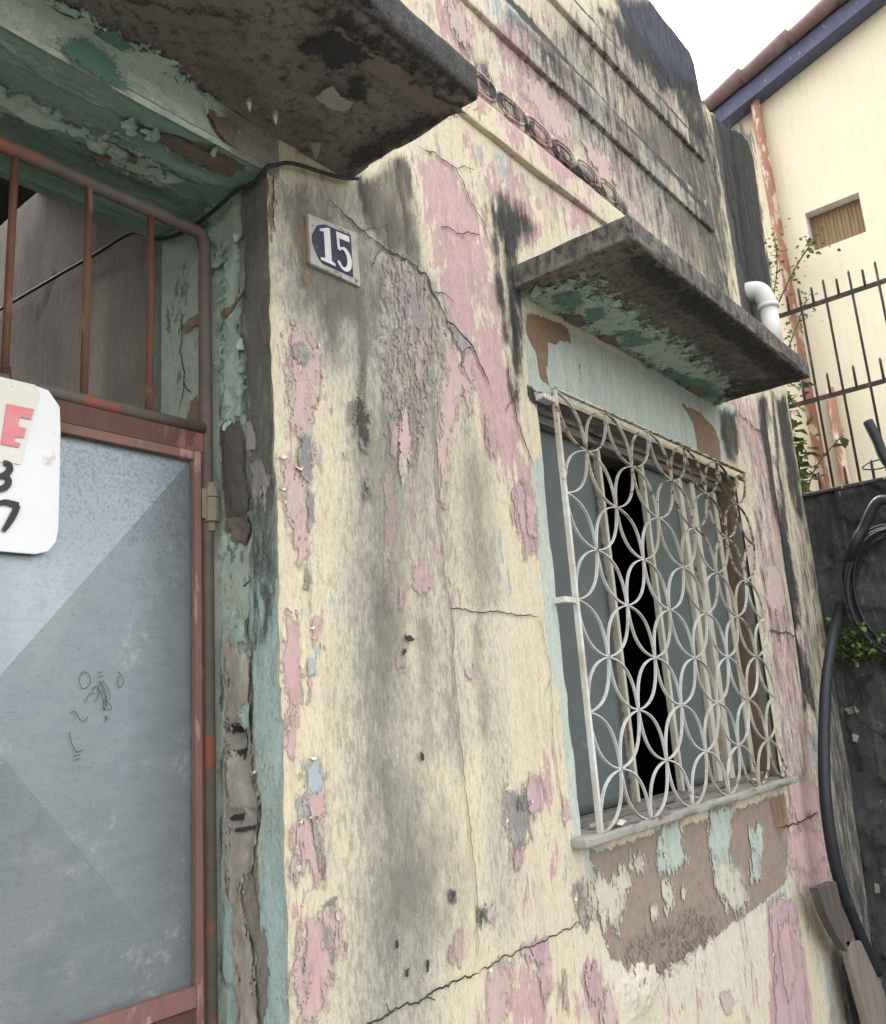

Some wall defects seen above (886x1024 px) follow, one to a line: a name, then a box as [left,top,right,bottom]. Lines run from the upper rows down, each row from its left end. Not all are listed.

peeling [0,0,244,194]
crack [179,320,192,408]
peeling [375,247,503,513]
crack [419,146,490,248]
leakage [486,185,537,413]
peeling [519,271,743,411]
leakage [586,0,817,714]
crack [331,201,581,1024]
spalling [221,614,260,1024]
peeling [278,605,349,1024]
peeling [571,773,826,1024]
crack [780,812,819,940]